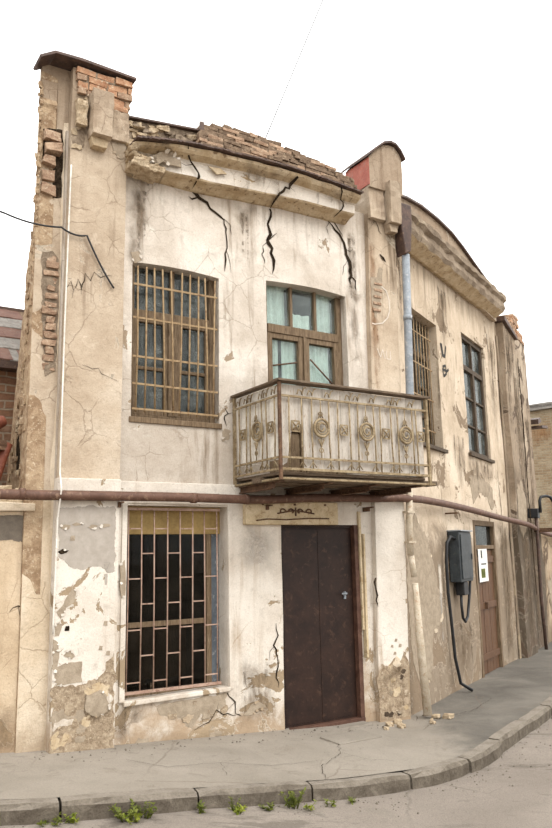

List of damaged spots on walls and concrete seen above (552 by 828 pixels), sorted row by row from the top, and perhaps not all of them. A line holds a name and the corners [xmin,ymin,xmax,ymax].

crack [180,145,232,268]
crack [262,176,299,274]
crack [326,187,356,289]
flaking render [49,588,117,754]
flaking render [157,692,228,728]
crack [195,693,241,730]
crack [270,627,279,688]
peeling [376,513,444,720]